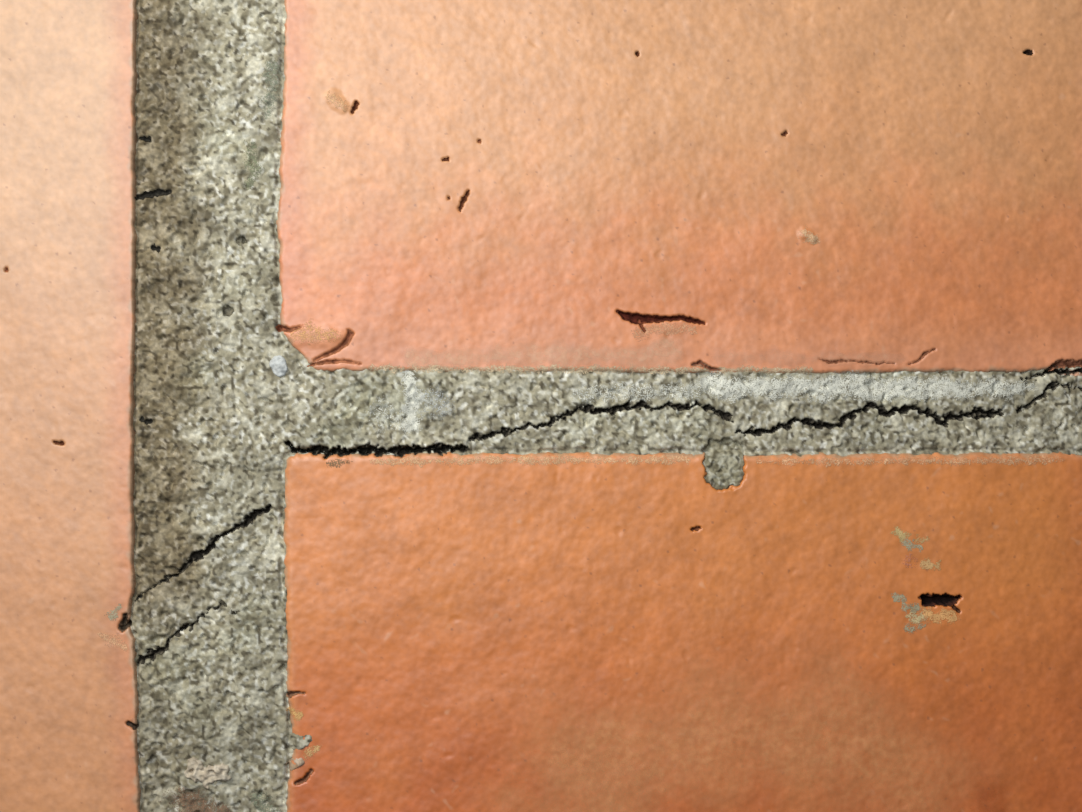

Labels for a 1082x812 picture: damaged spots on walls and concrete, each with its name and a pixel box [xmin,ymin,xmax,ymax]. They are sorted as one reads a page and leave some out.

spalling [275,319,361,367]
crack [820,348,935,365]
crack [284,365,1082,459]
crack [135,504,272,602]
spalling [891,526,941,570]
crack [137,600,240,666]
spalling [891,592,962,633]